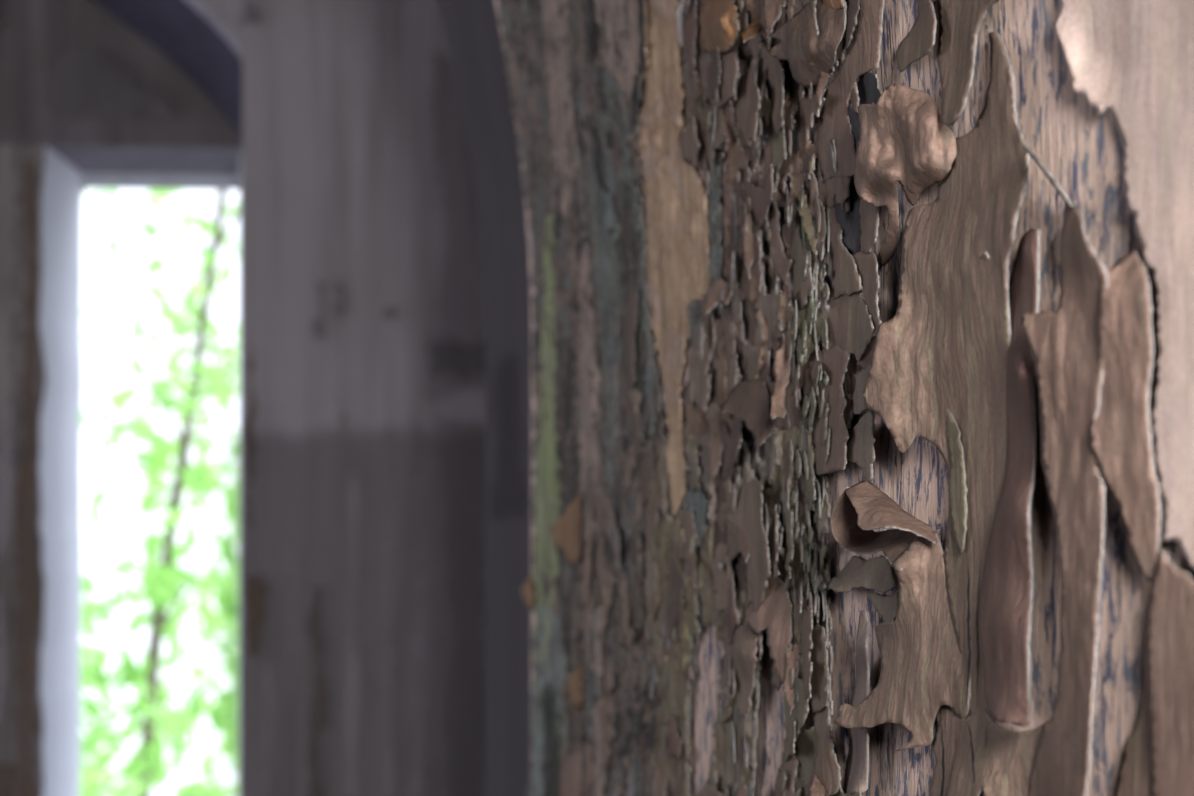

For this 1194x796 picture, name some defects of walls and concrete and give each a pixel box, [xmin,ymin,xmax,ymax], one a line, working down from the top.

peeling [498,0,1194,796]